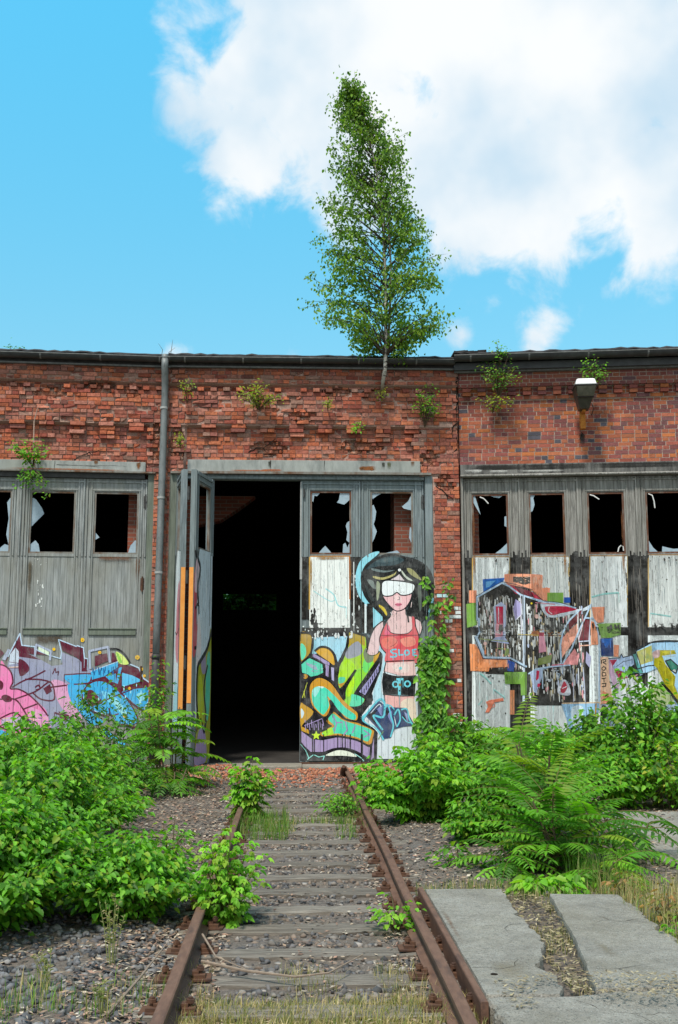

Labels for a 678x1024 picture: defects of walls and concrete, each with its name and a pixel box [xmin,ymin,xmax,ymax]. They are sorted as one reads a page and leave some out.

peeling [310,575,360,640]